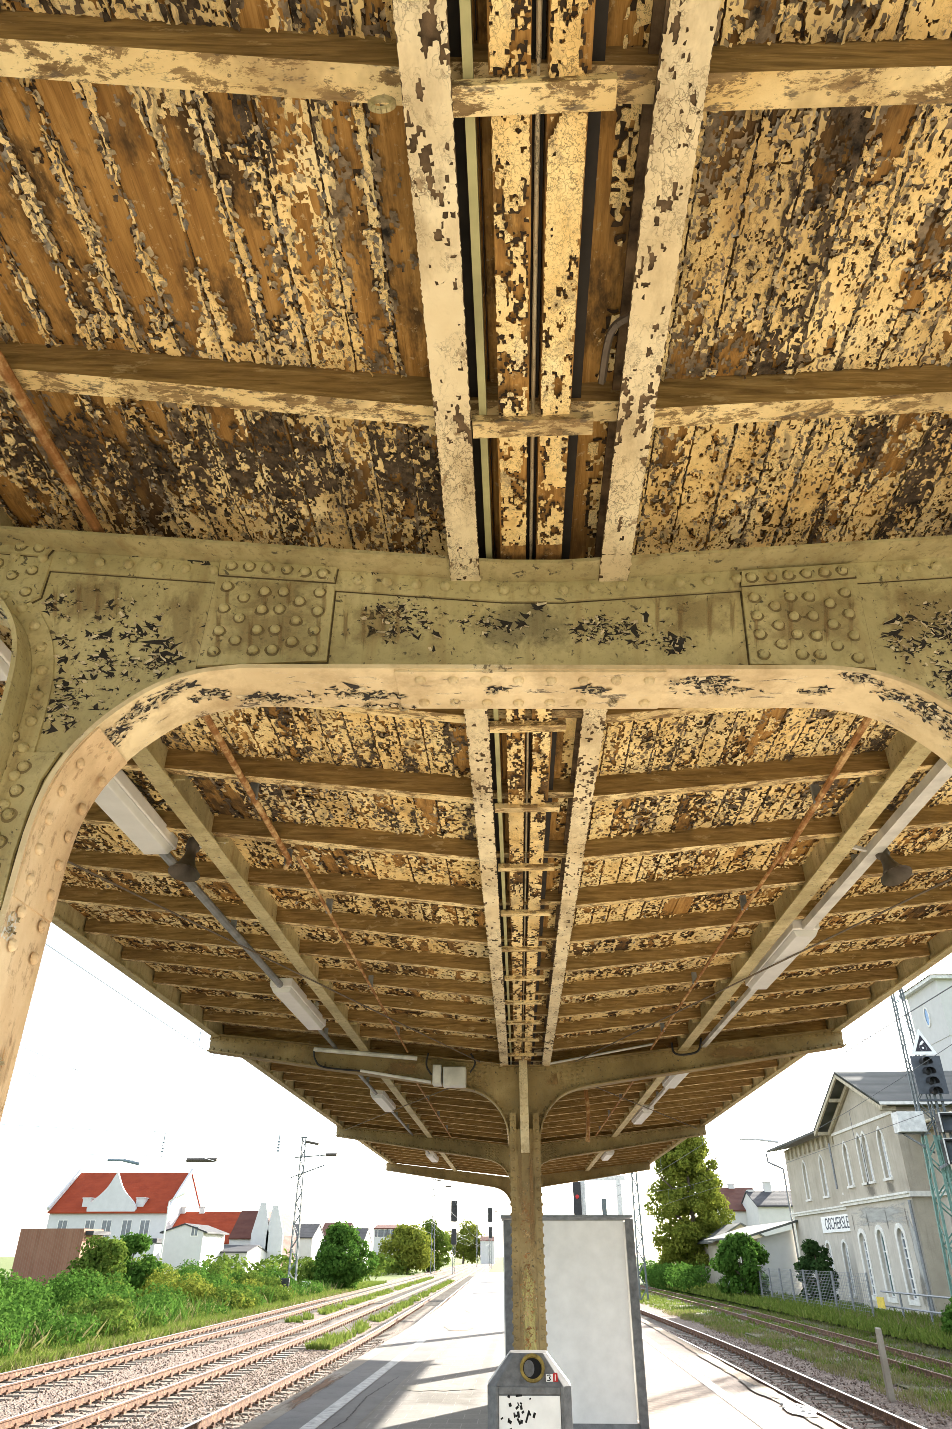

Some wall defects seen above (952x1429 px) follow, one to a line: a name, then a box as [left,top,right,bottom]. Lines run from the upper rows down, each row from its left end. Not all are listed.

peeling [489,0,532,80]
peeling [549,0,594,78]
peeling [0,0,481,581]
peeling [491,112,588,417]
peeling [583,0,952,582]
peeling [499,435,568,546]
peeling [41,582,952,1067]